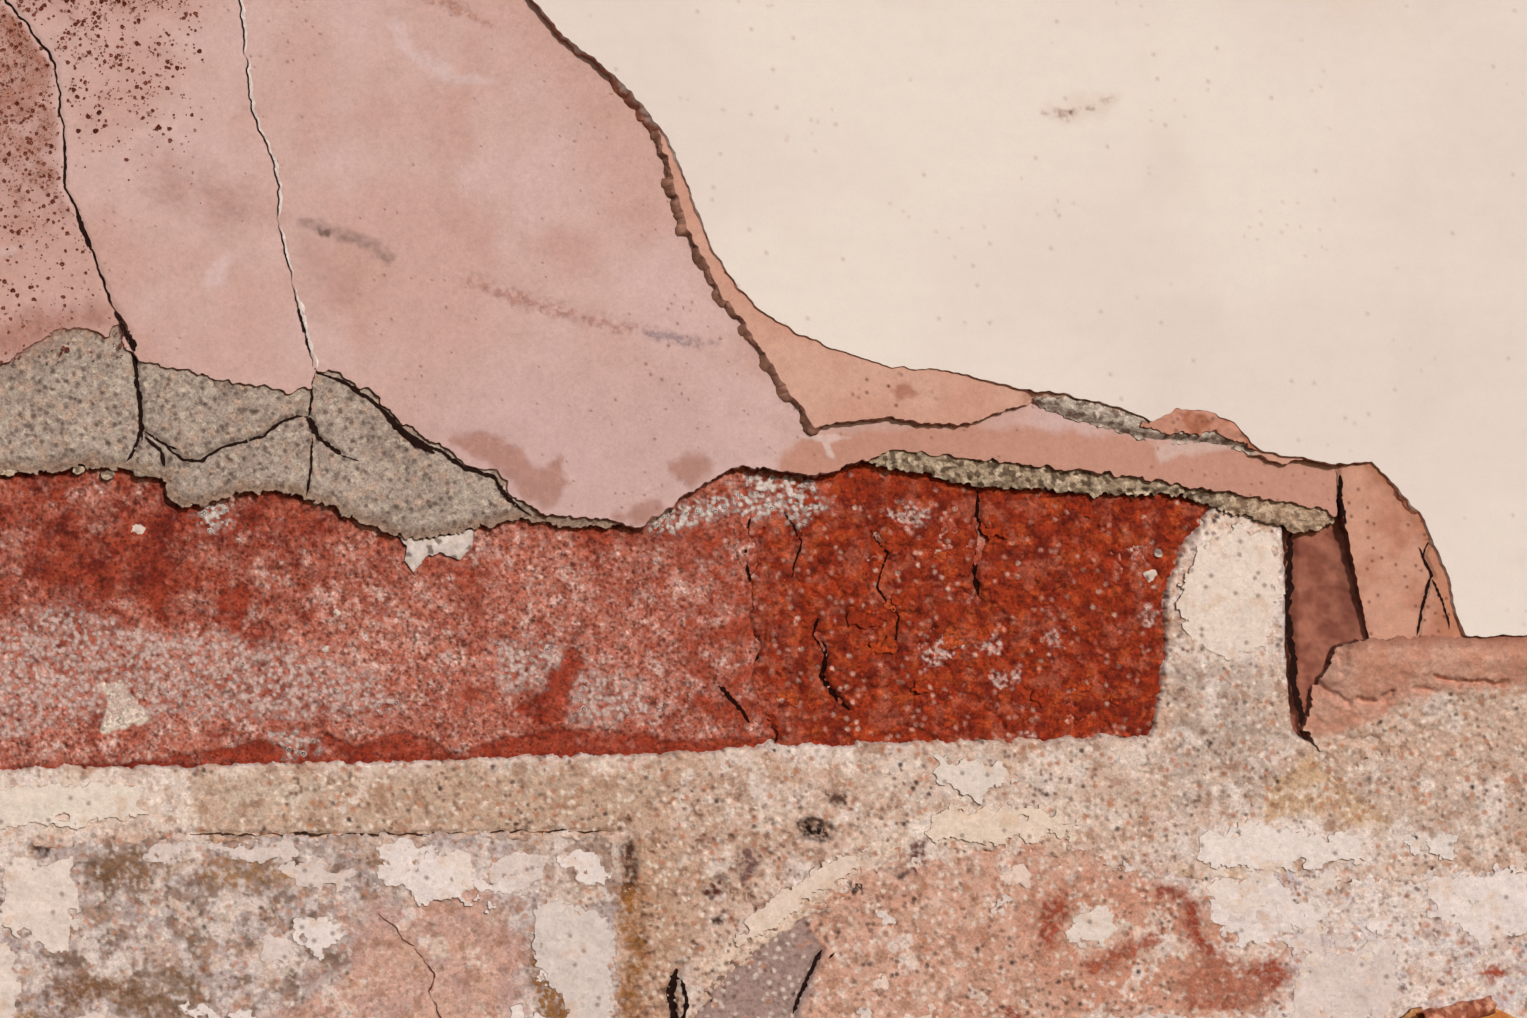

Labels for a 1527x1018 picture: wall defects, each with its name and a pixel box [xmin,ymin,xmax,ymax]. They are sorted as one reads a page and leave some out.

crack [4,0,531,516]
peeling [650,130,1305,465]
spalling [0,325,618,572]
crack [744,484,802,581]
crack [870,530,900,641]
crack [972,490,987,597]
crack [718,685,772,728]
crack [812,618,850,711]
spalling [737,450,1464,847]
peeling [374,837,612,914]
peeling [0,856,84,1018]
peeling [531,899,619,1018]